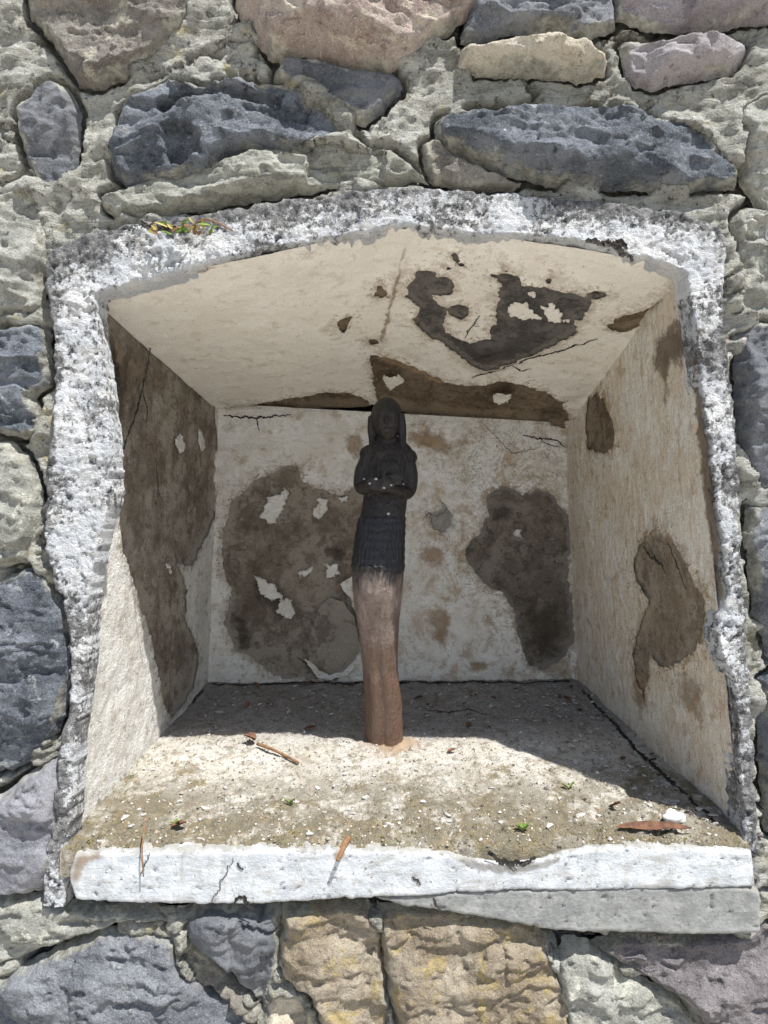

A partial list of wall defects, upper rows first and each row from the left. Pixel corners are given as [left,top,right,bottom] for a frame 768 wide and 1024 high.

peeling [256,253,607,428]
crack [472,339,598,378]
crack [224,414,291,429]
crack [482,423,566,454]
peeling [585,391,614,453]
peeling [107,314,363,718]
peeling [465,486,575,670]
peeling [632,529,706,702]
crack [211,858,255,909]
crack [487,851,536,871]